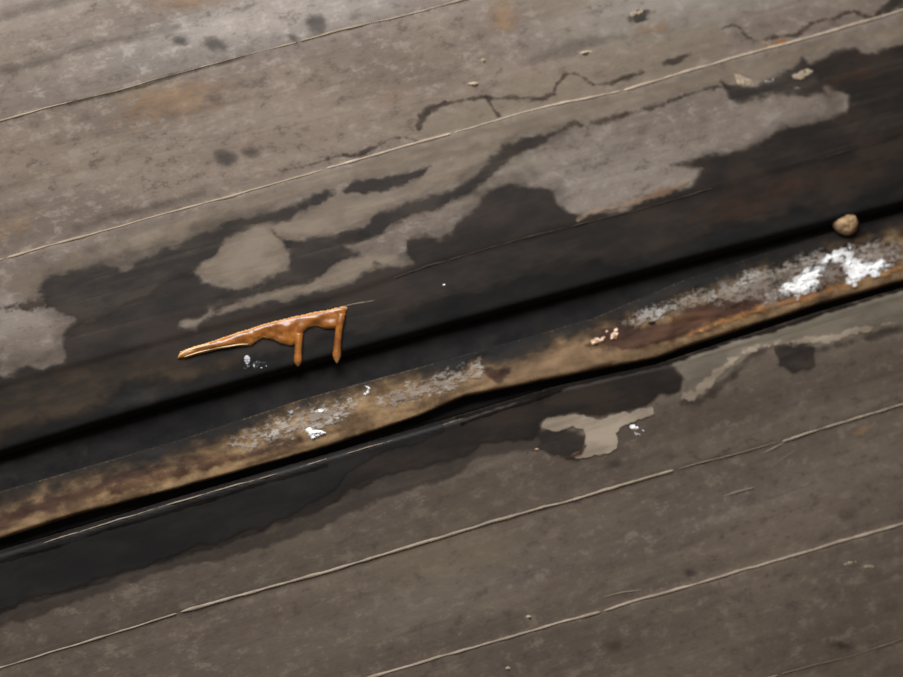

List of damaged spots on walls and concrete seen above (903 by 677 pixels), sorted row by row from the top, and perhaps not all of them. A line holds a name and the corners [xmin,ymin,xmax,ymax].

leakage [836,0,903,18]
peeling [735,74,774,87]
peeling [792,69,813,80]
leakage [0,20,903,442]
corrosion [587,241,903,349]
corrosion [485,367,510,382]
leakage [0,288,903,613]
peeling [542,407,654,458]